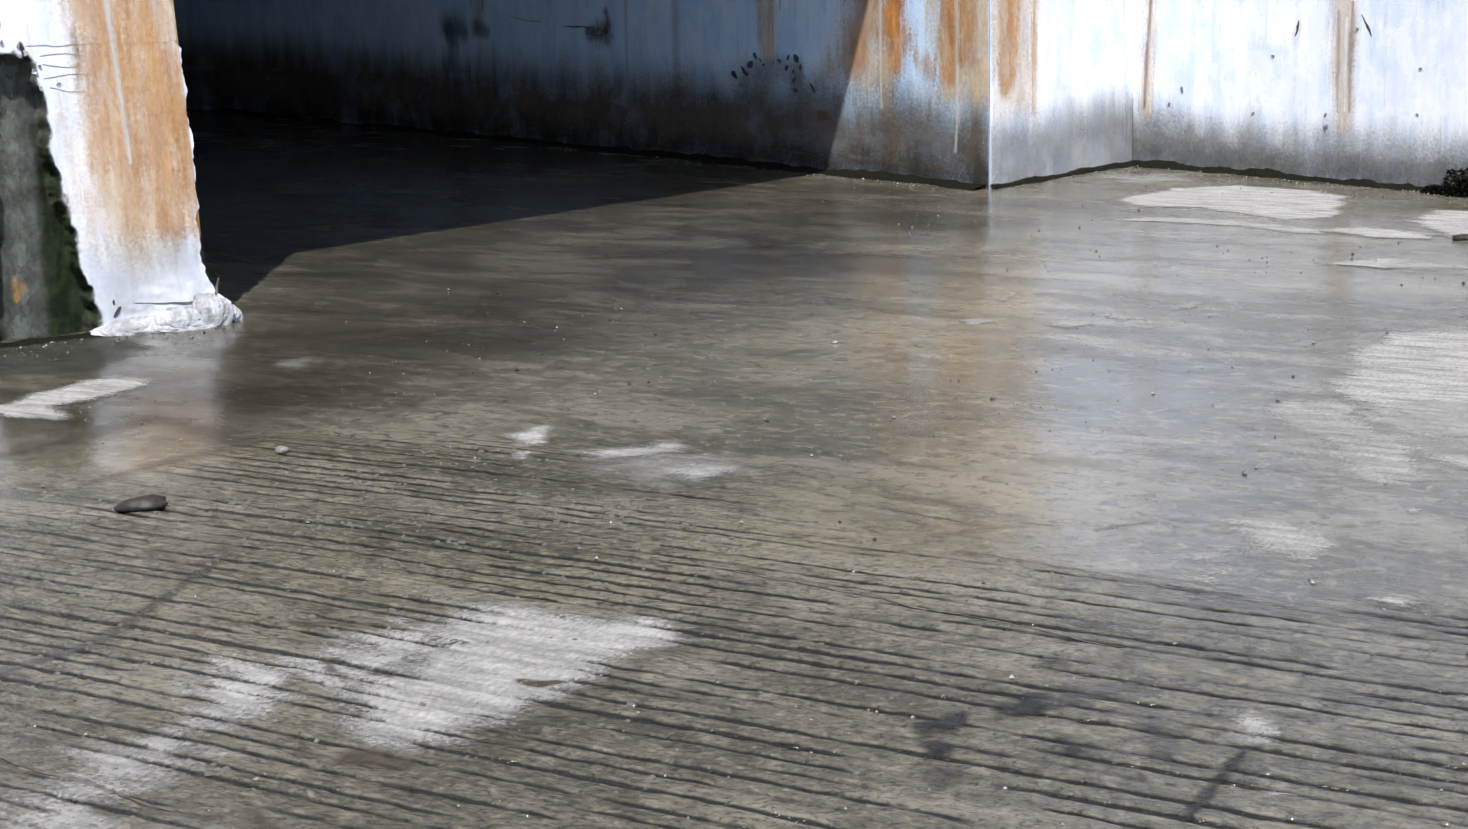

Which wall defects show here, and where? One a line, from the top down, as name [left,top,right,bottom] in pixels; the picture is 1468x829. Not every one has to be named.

spalling [0,39,121,341]
rust [70,0,193,249]
water stain [176,0,1468,189]
rust [828,0,911,111]
rust [926,0,1020,106]
crack [1030,0,1038,105]